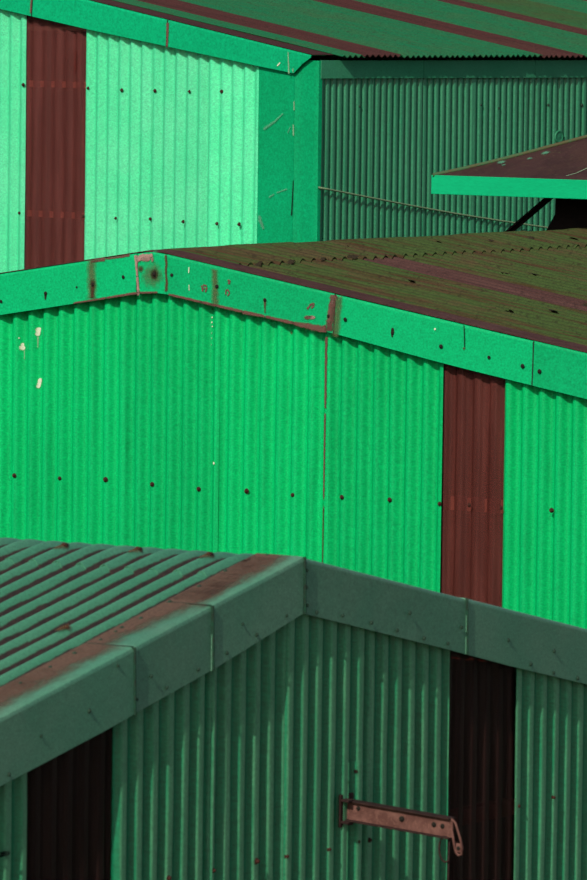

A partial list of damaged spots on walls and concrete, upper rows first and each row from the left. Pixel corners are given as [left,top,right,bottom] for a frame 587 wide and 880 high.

corrosion [73,255,341,563]